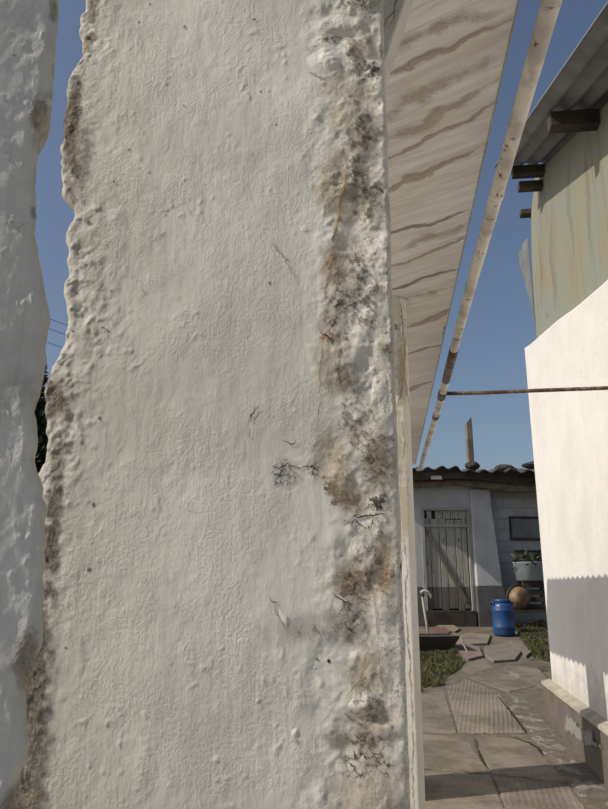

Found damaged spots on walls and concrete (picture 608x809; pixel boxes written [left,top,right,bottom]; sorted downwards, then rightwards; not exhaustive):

water stain [341,40,380,88]
water stain [342,109,472,222]
corrosion [324,153,347,323]
water stain [342,253,382,328]
crack [268,439,320,489]
water stain [335,365,396,501]
water stain [344,543,375,606]
water stain [350,671,386,723]
crack [335,743,398,780]